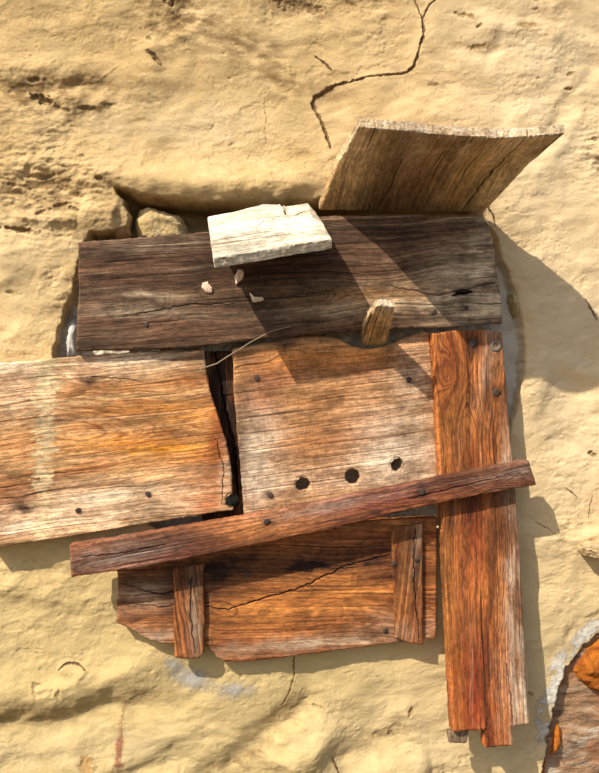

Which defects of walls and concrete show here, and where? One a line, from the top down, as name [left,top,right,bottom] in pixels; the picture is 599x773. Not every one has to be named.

crack [310,0,436,149]
crack [281,656,295,706]
flaking render [528,619,599,773]